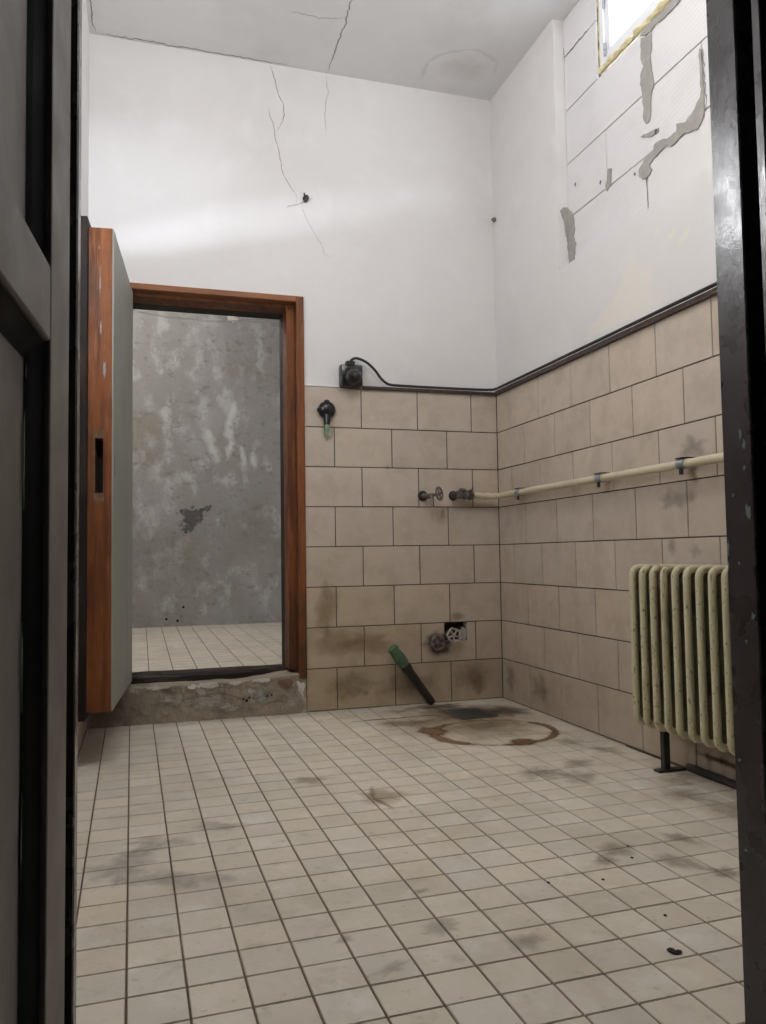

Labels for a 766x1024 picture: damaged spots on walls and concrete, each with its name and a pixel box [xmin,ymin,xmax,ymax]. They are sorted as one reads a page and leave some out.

crack [329,0,352,67]
water stain [132,350,281,625]
peeling [145,678,305,712]
rust [354,715,470,744]
rust [506,722,558,745]